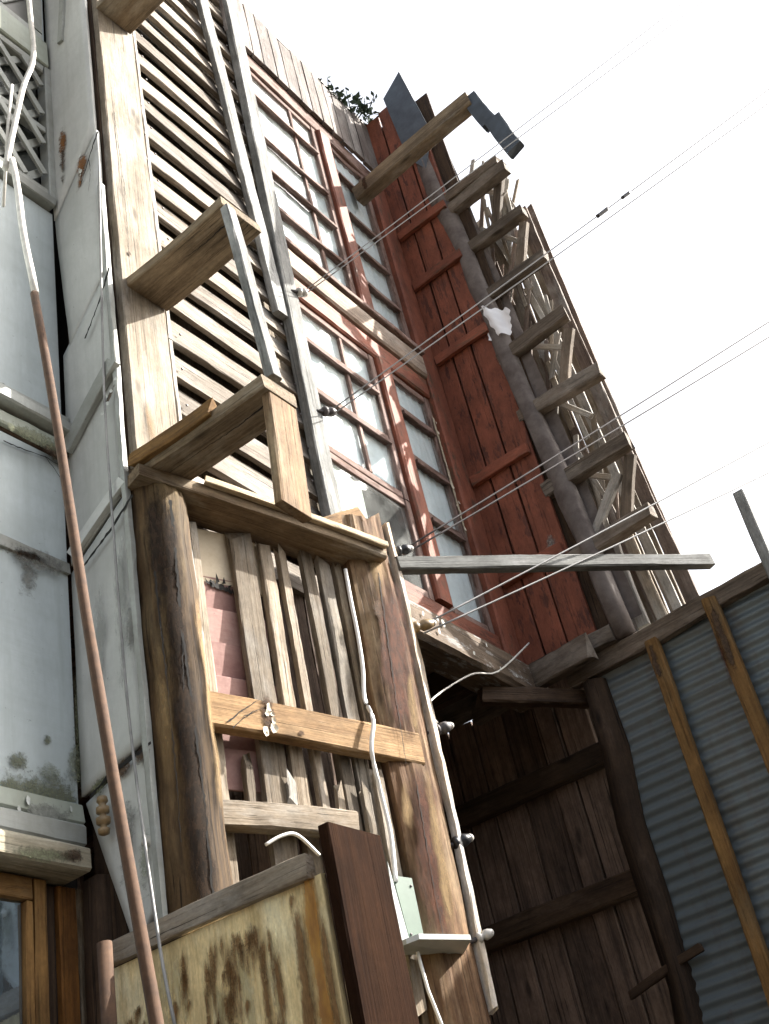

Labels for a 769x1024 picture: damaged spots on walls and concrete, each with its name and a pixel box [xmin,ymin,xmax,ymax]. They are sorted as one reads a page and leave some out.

rust [58,131,66,182]
rust [77,152,87,188]
leakage [0,680,81,803]
rust [294,879,340,1024]